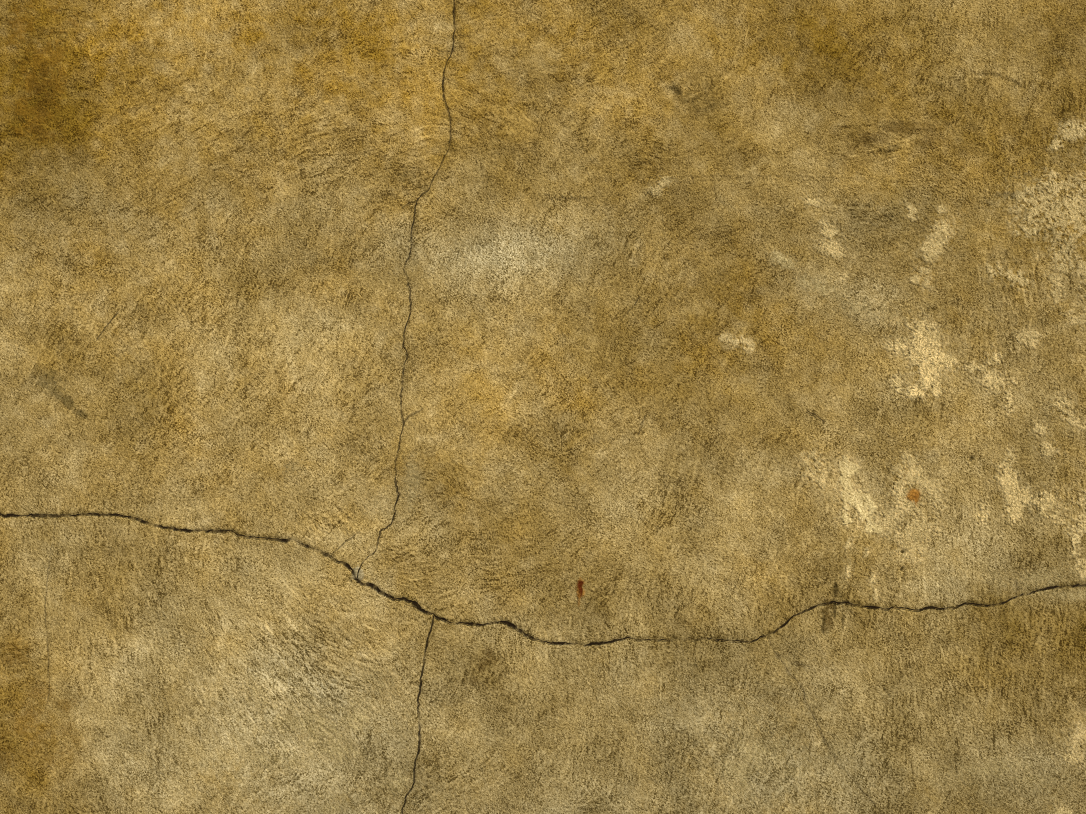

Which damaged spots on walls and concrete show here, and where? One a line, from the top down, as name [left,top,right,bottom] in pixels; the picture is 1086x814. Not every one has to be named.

crack [442,0,455,141]
crack [0,173,671,814]
crack [707,584,1086,738]